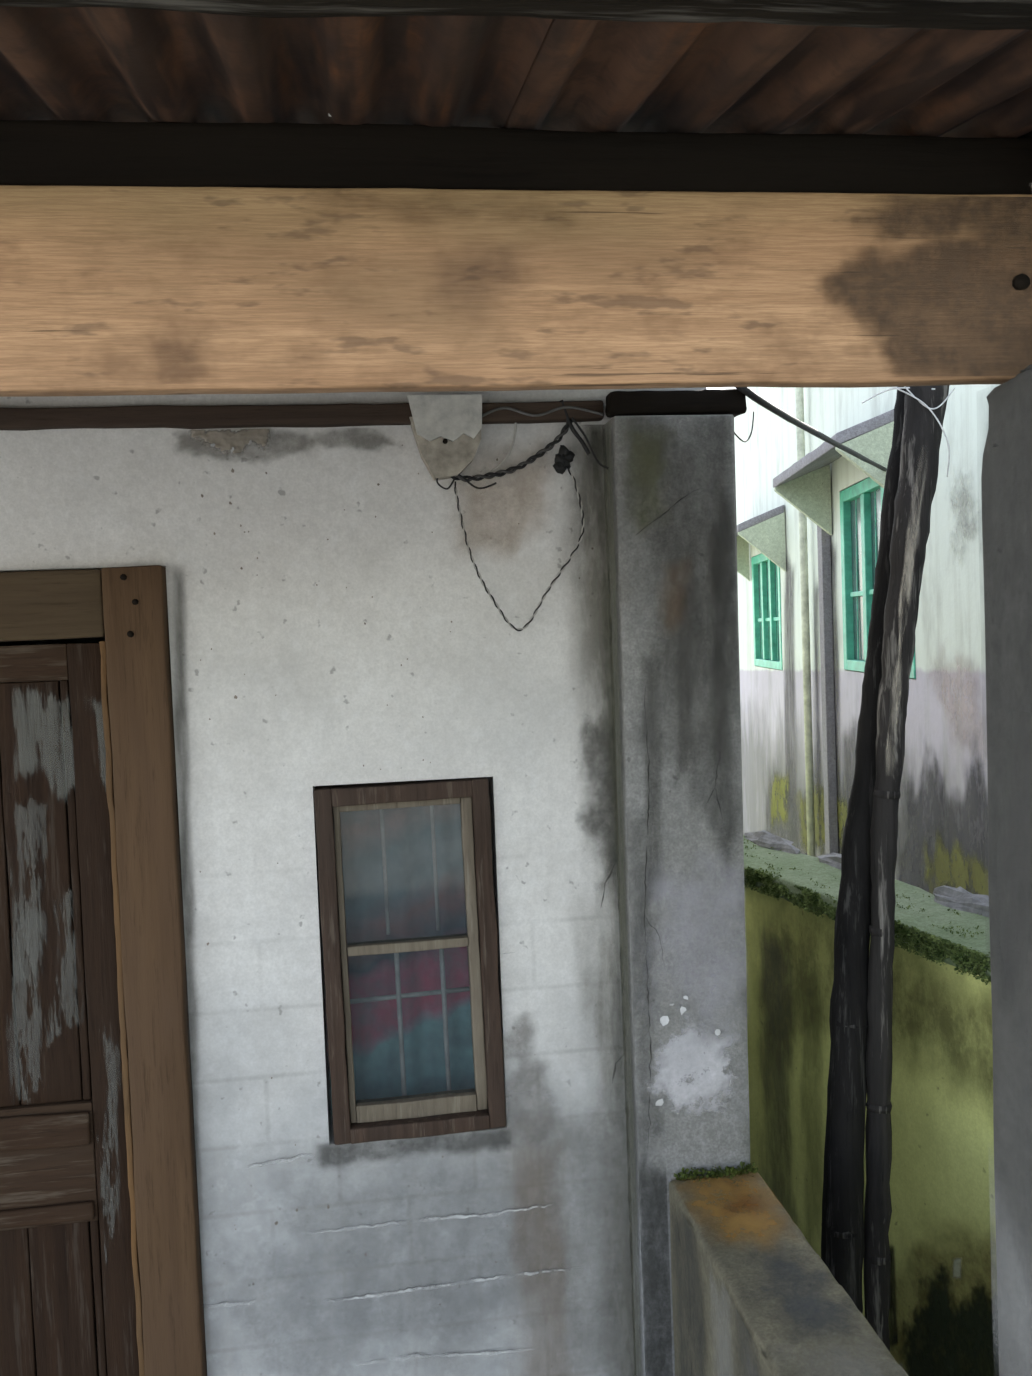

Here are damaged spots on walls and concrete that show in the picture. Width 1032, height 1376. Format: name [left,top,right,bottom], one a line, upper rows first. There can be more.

water stain [826,195,1032,376]
water stain [579,431,619,883]
peeling [655,996,731,1108]
water stain [322,1131,510,1164]
crack [428,1204,548,1220]
rust [690,1172,782,1240]
crack [307,1268,573,1304]